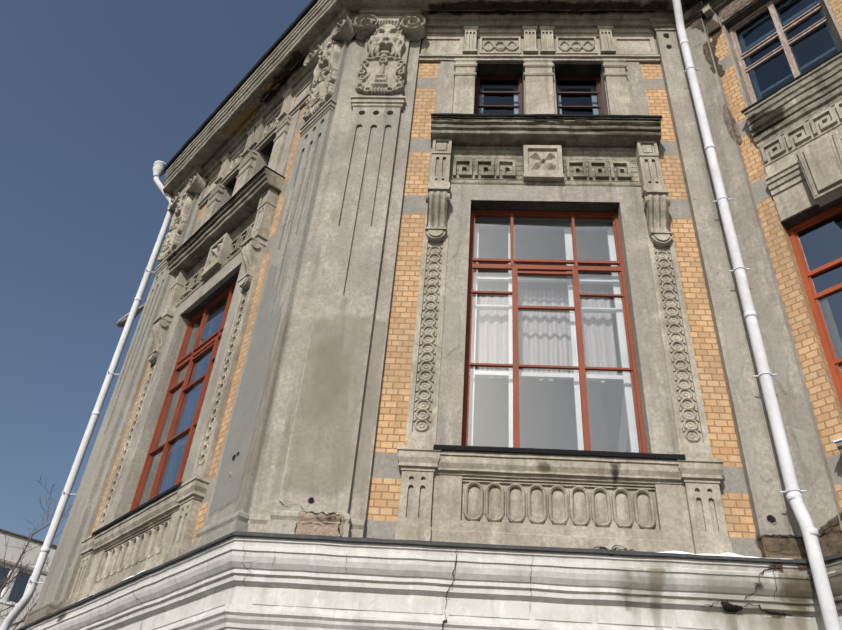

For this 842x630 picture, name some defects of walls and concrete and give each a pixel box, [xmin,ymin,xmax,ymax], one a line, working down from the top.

damp [428,0,669,15]
damp [683,0,712,10]
flaking render [684,0,751,77]
damp [749,107,784,138]
flaking render [294,511,344,536]
flaking render [703,420,813,618]
flaking render [818,512,842,563]
crack [442,550,457,630]
damp [783,573,814,608]
damp [826,566,842,611]